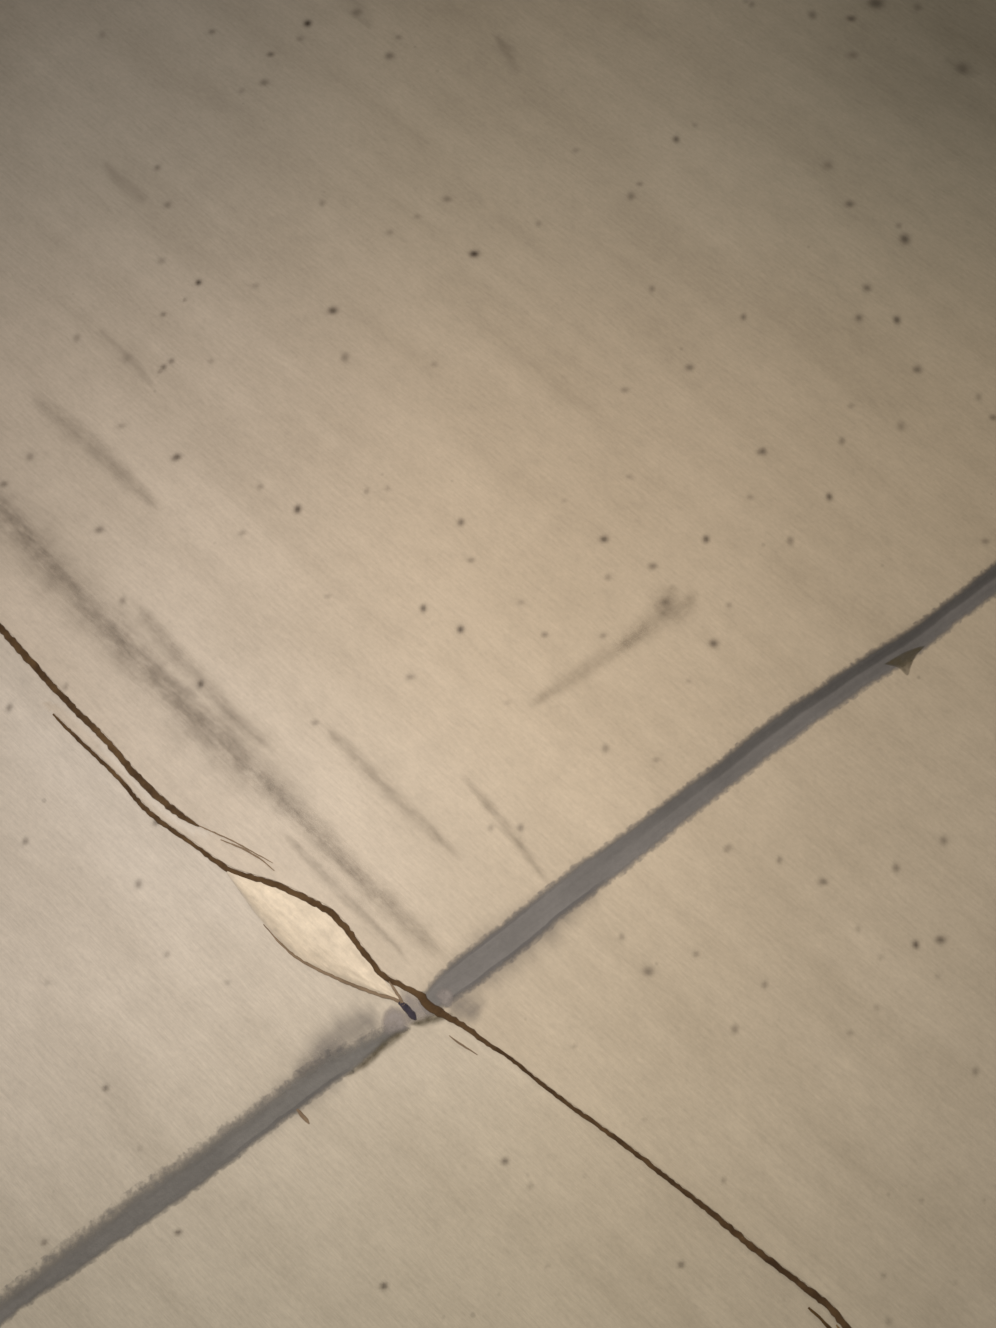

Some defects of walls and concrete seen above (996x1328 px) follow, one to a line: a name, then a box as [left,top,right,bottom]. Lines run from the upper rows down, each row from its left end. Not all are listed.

crack [0,605,874,1328]